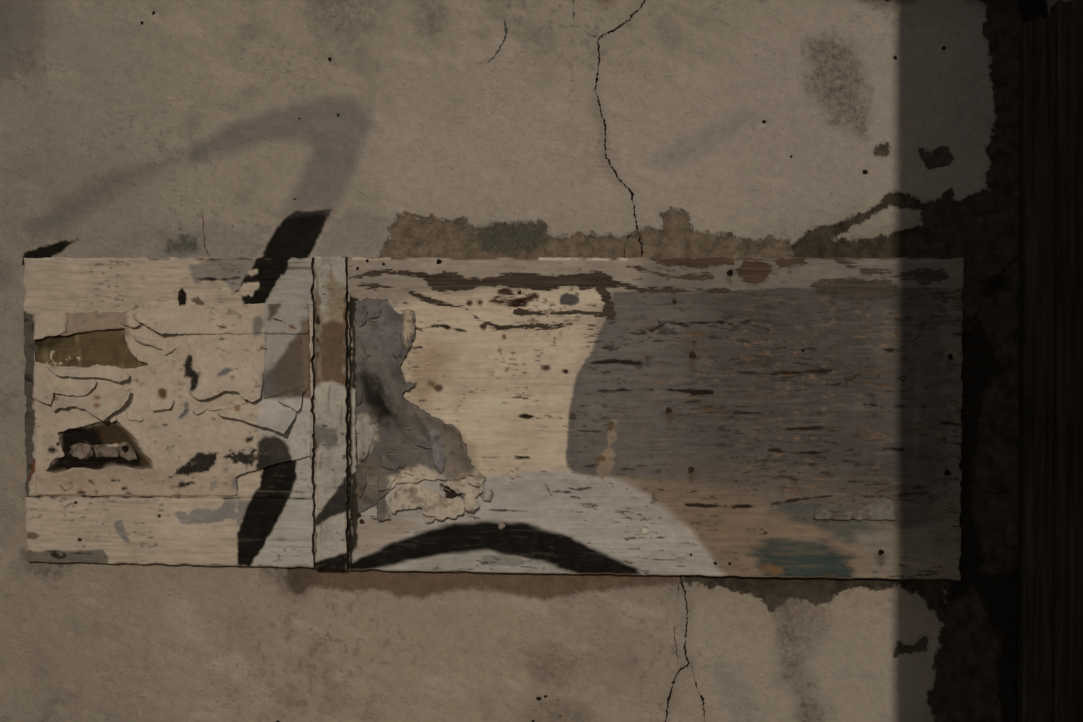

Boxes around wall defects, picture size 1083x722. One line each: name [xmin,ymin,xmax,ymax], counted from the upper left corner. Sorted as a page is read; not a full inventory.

crack [573,0,645,257]
peeling [349,0,1022,722]
crack [664,575,705,722]